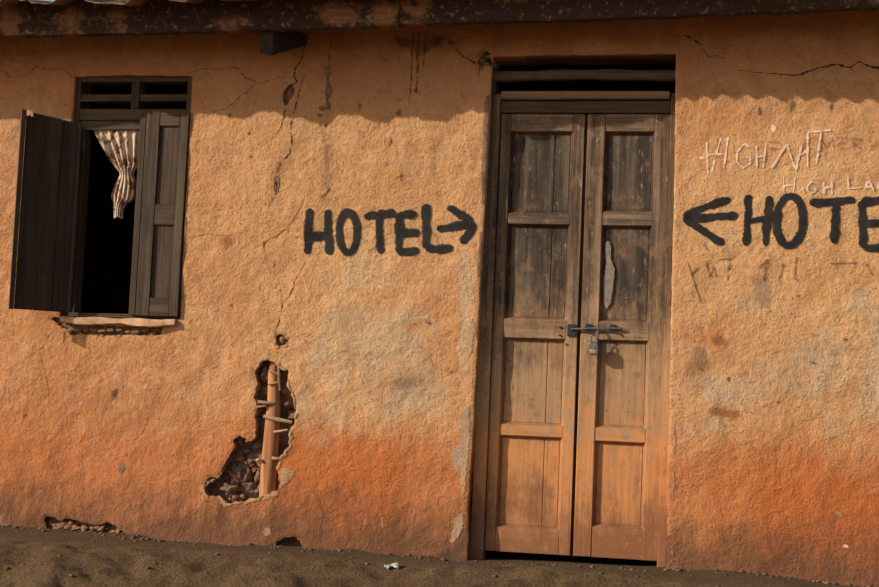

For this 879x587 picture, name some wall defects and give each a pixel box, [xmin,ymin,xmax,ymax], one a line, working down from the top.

crack [679,35,879,76]
spalling [282,84,295,108]
crack [194,33,330,338]
flaking render [54,317,162,338]
flaking render [201,358,299,508]
peeling [451,369,474,494]
flaking render [47,517,124,533]
peeling [450,513,464,543]